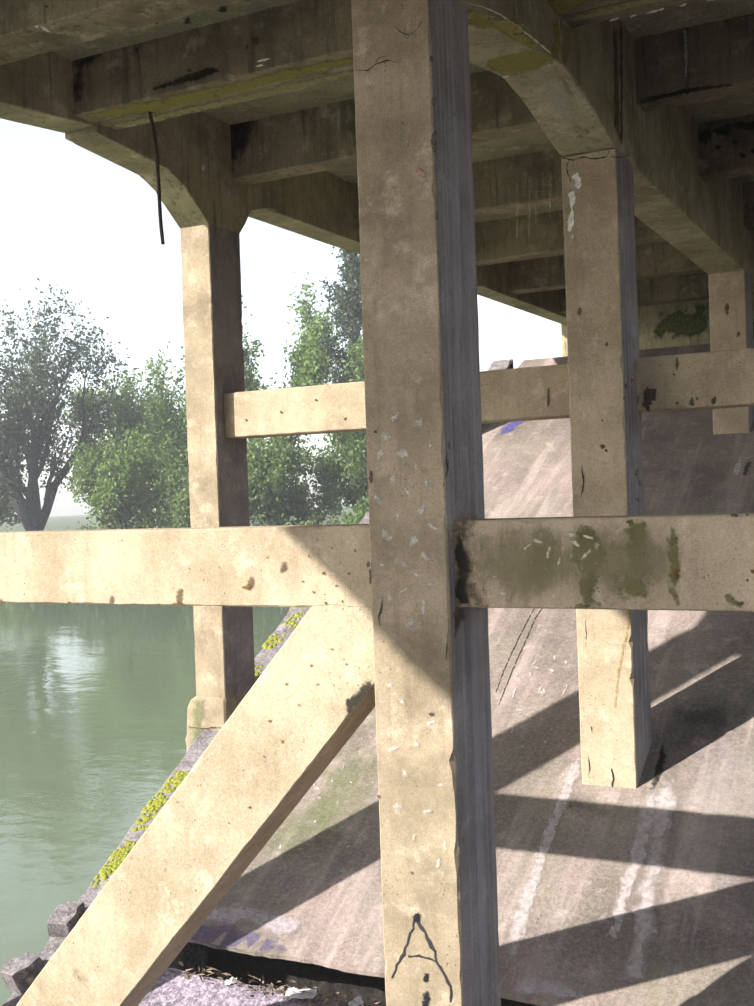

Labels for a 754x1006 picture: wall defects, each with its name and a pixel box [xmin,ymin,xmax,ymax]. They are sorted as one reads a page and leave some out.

damp [667,529,680,604]
damp [509,762,580,954]
damp [610,745,677,978]